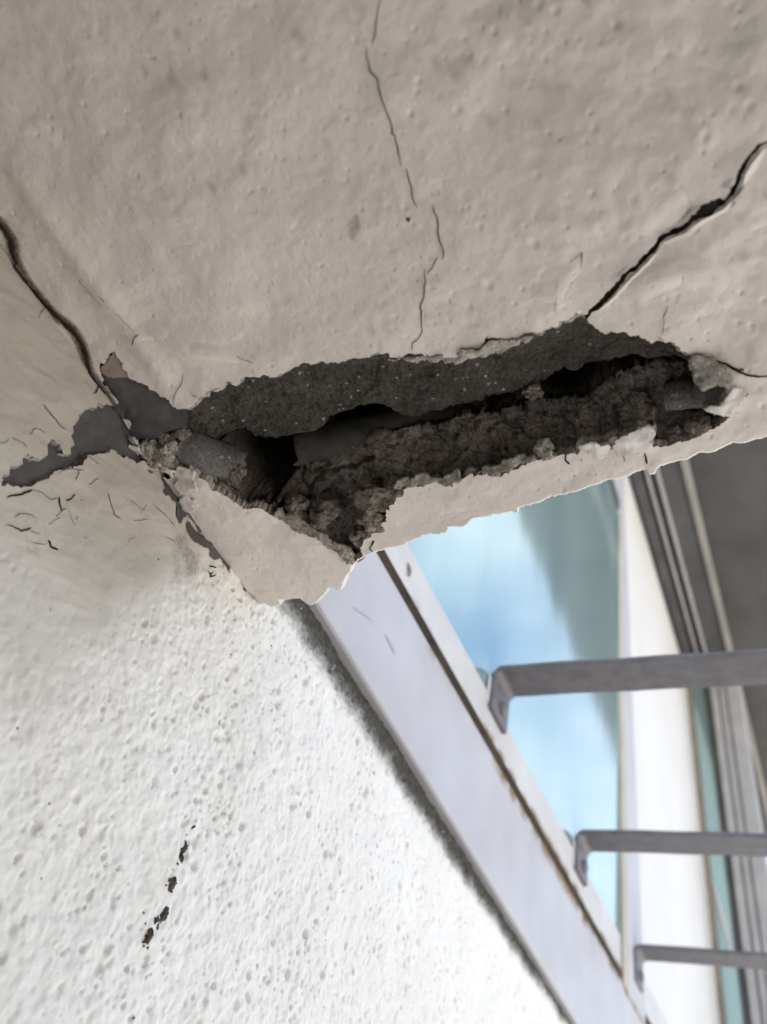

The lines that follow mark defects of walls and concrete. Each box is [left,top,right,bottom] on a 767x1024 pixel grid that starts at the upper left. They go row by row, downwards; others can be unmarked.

crack [0,222,106,394]
crack [79,281,139,345]
crack [366,1,444,350]
crack [589,141,767,316]
crack [2,405,65,447]
crack [6,455,176,550]
spalling [1,310,750,572]